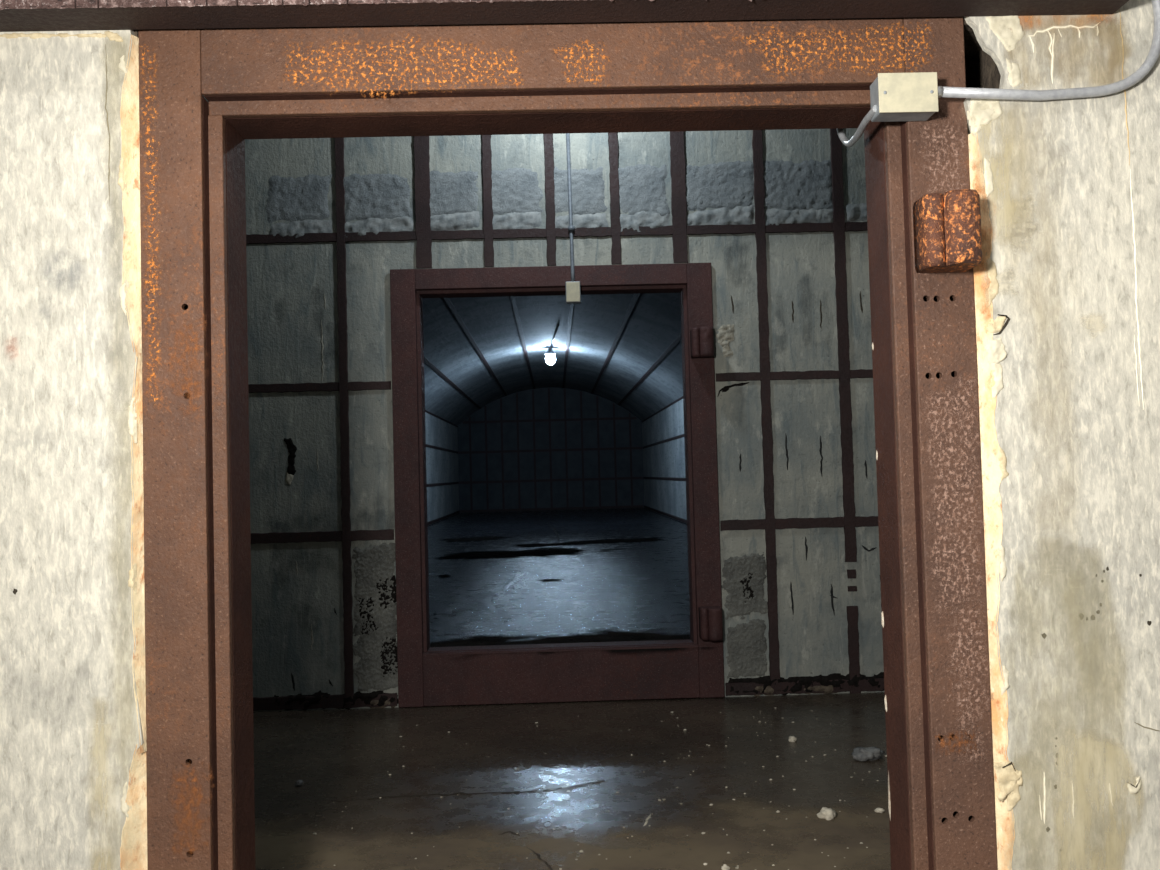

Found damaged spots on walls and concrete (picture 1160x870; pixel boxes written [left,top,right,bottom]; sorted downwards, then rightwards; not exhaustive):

corrosion [286,35,521,95]
corrosion [555,41,606,84]
corrosion [746,23,932,74]
peeling [986,16,1024,87]
corrosion [922,122,987,209]
corrosion [141,46,198,409]
spalling [0,31,148,870]
spalling [967,98,1023,870]
corrosion [927,378,989,760]
damp [1039,737,1129,870]
crack [498,831,553,870]